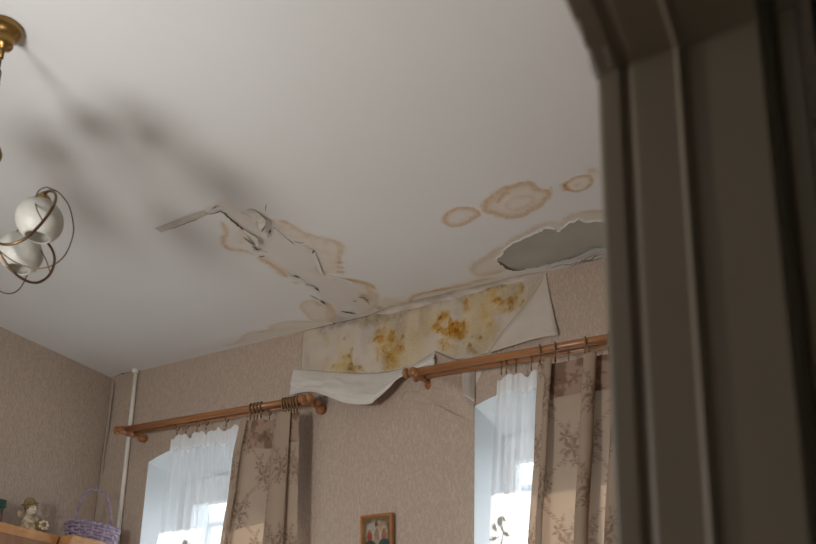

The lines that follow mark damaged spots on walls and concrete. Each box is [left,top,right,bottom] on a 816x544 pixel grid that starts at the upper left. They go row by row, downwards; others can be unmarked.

peeling [155,204,354,283]
peeling [301,218,605,373]